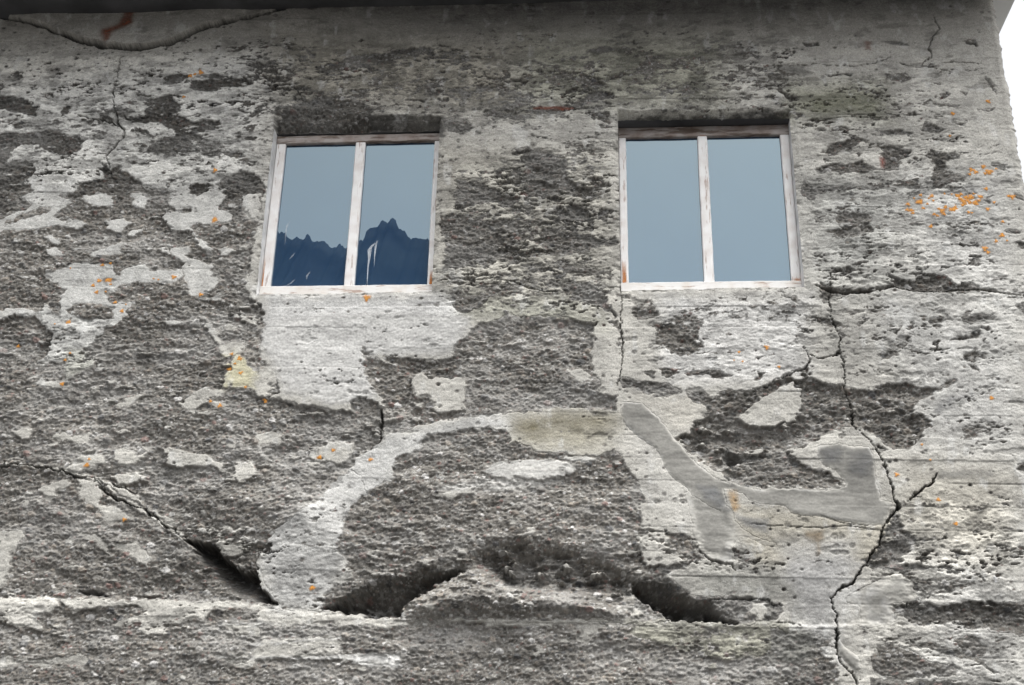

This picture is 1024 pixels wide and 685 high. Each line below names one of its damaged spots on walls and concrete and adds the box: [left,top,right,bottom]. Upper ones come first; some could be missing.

corrosion [102,12,132,39]
crack [768,19,979,71]
spalling [0,93,54,116]
crack [78,59,147,179]
spalling [129,73,254,154]
spalling [819,264,997,304]
crack [616,299,624,386]
spalling [928,313,995,373]
spalling [0,129,956,685]
crack [0,463,187,539]
crack [750,282,1024,685]